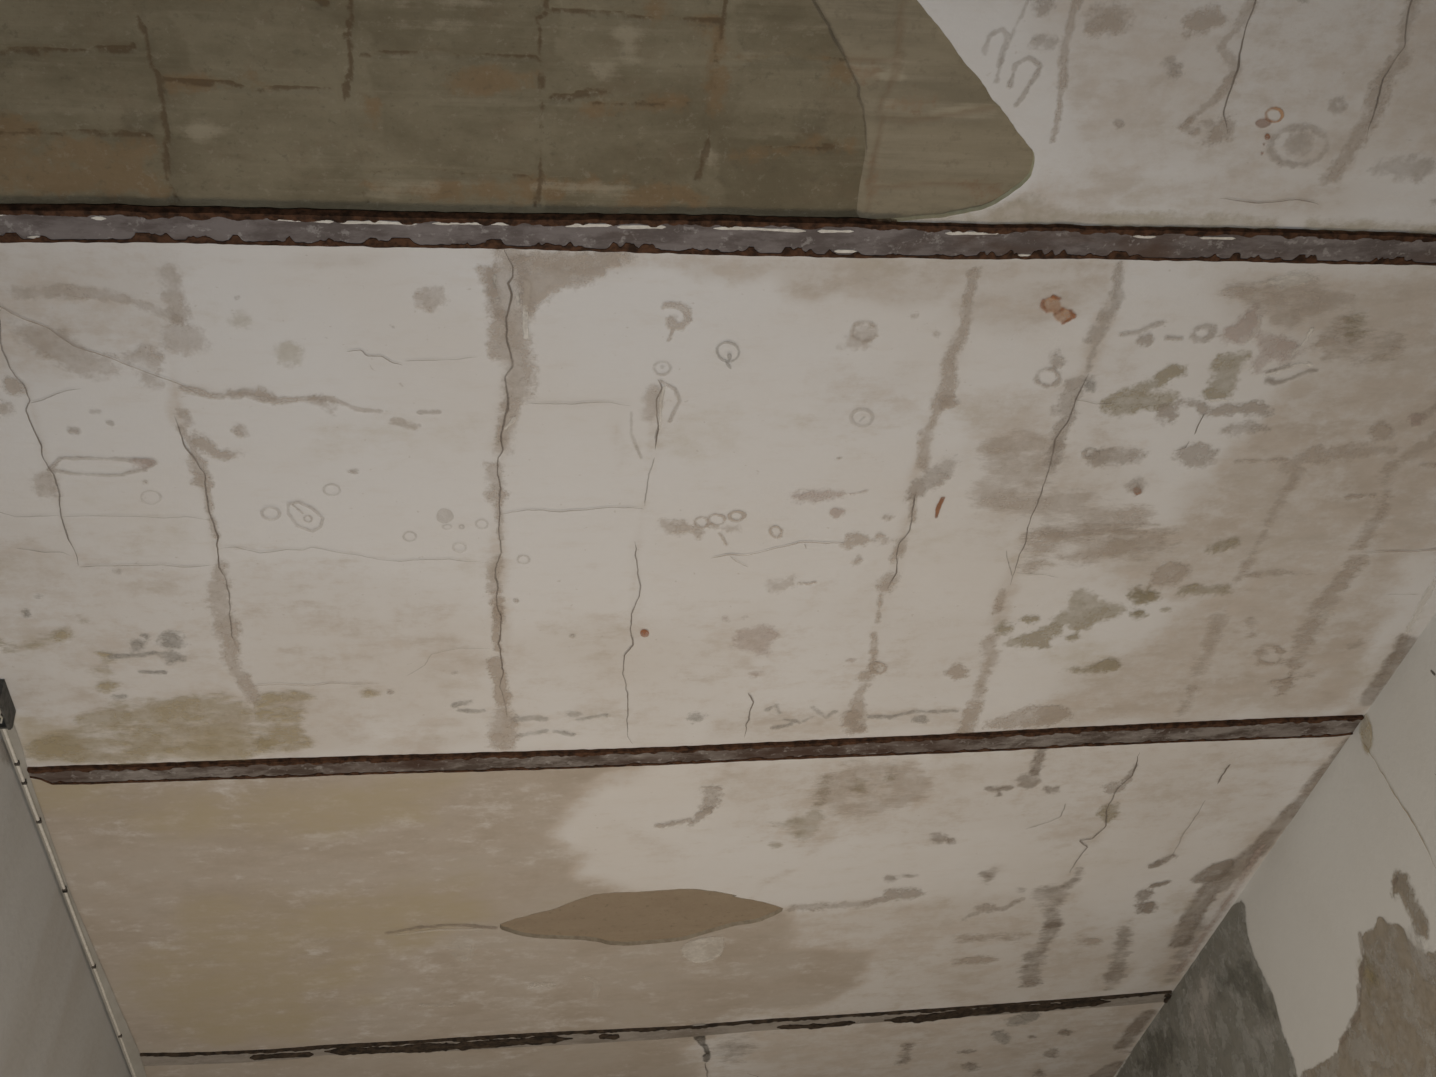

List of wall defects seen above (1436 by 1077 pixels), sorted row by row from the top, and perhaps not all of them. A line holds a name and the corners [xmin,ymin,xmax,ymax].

flaking render [0,0,1035,253]
corrosion [0,204,1436,266]
leakage [1087,365,1268,421]
crack [0,306,232,636]
crack [497,395,509,541]
crack [623,545,640,744]
leakage [999,607,1115,648]
leakage [1075,659,1120,672]
corrosion [27,715,1372,785]
flaking render [500,889,783,963]
peeling [1117,872,1436,1077]
corrosion [140,990,1172,1060]